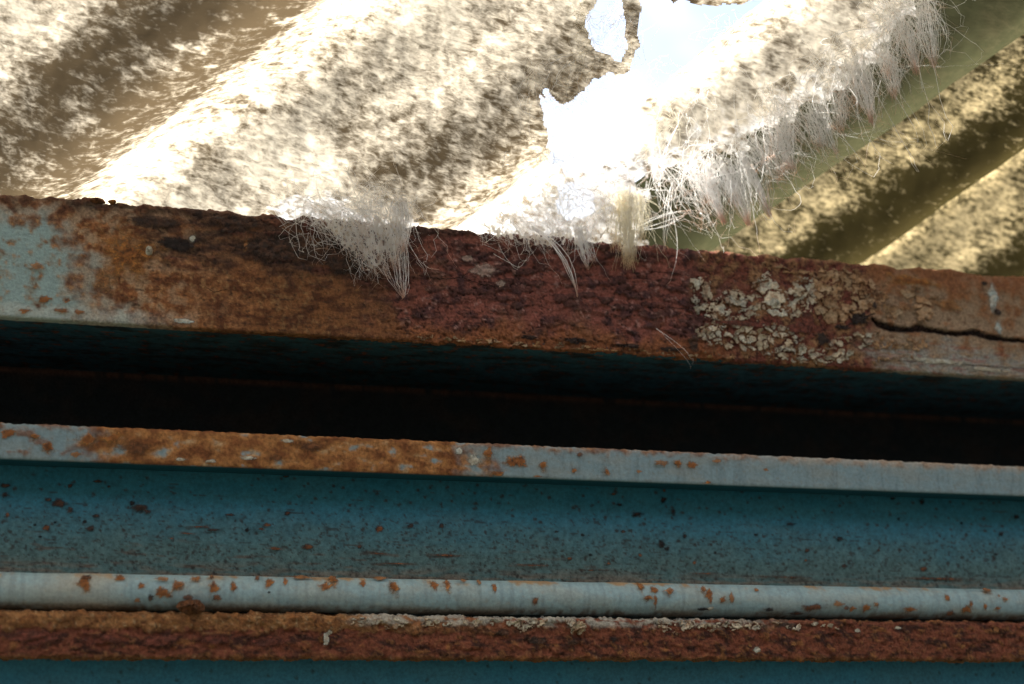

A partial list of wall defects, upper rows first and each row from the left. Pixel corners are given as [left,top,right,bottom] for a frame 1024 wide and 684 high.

corrosion [127,216,195,252]
corrosion [209,213,308,266]
corrosion [321,245,368,276]
corrosion [19,296,85,315]
peeling [660,271,877,352]
corrosion [762,258,940,364]
crack [812,288,1024,369]
corrosion [417,335,750,359]
corrosion [483,447,546,477]
corrosion [77,575,91,592]
corrosion [135,575,237,602]
corrosion [255,575,338,593]